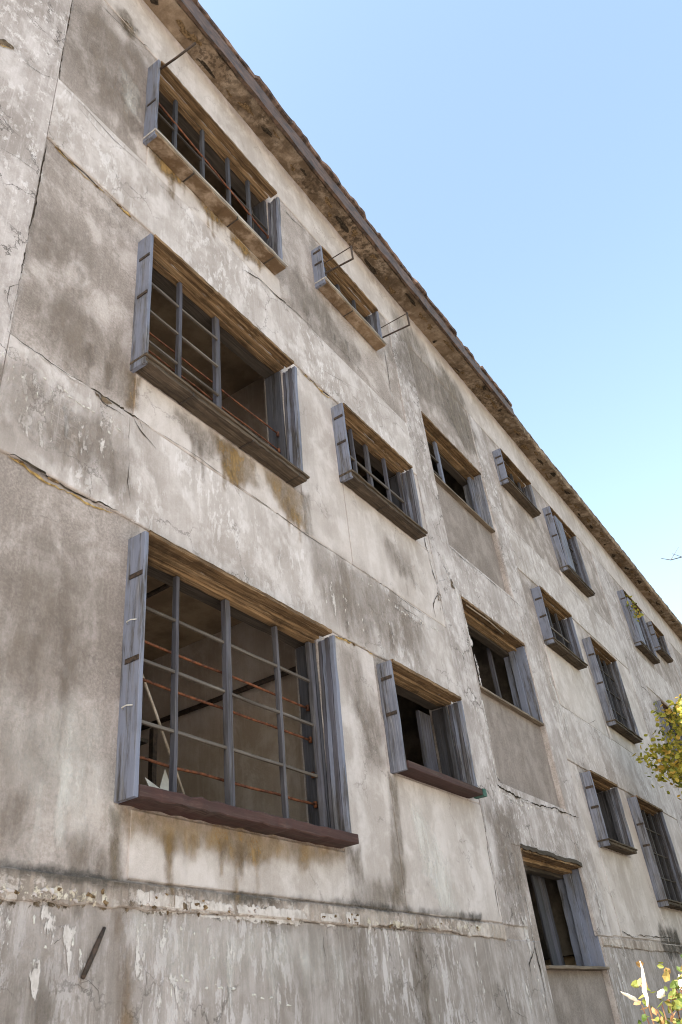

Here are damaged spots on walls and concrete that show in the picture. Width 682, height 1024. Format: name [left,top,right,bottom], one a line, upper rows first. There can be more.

crack [7,149,519,617]
spalling [123,889,485,1002]